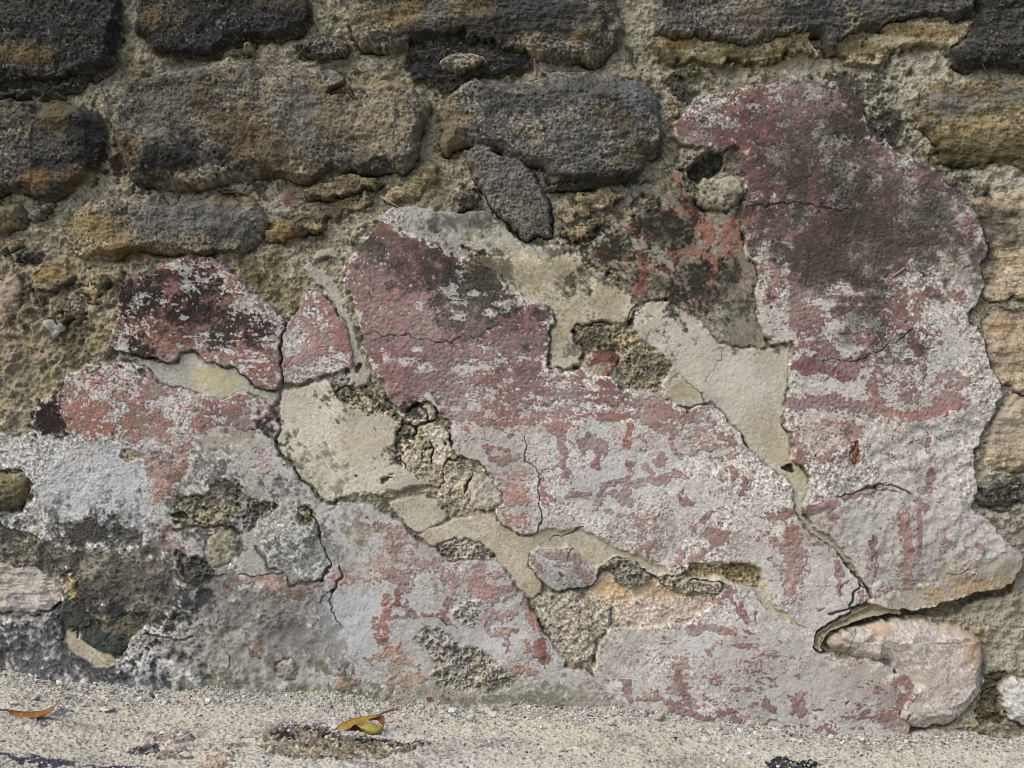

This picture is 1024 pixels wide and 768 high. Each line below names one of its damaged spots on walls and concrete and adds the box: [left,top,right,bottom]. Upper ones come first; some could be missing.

crack [746,192,856,212]
peeling [37,74,1016,700]
crack [171,450,344,627]
crack [524,437,585,578]
crack [836,483,913,498]
crack [828,554,873,651]
peeling [605,629,789,726]
peeling [783,674,916,736]